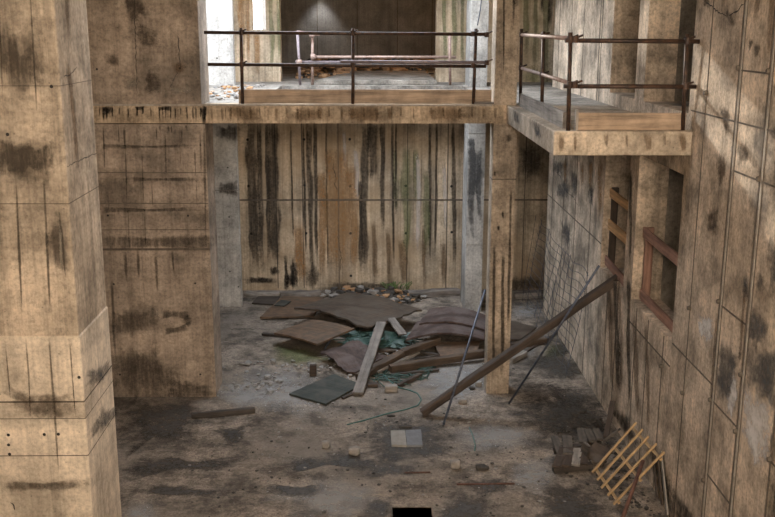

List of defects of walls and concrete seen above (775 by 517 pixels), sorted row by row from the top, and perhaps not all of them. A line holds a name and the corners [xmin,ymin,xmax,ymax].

leakage [0,144,46,180]
leakage [44,194,65,297]
leakage [221,126,281,262]
leakage [290,127,329,286]
leakage [354,110,397,261]
leakage [416,108,457,257]
leakage [520,145,541,177]
leakage [717,347,737,397]
leakage [749,310,767,340]
leakage [747,353,775,405]